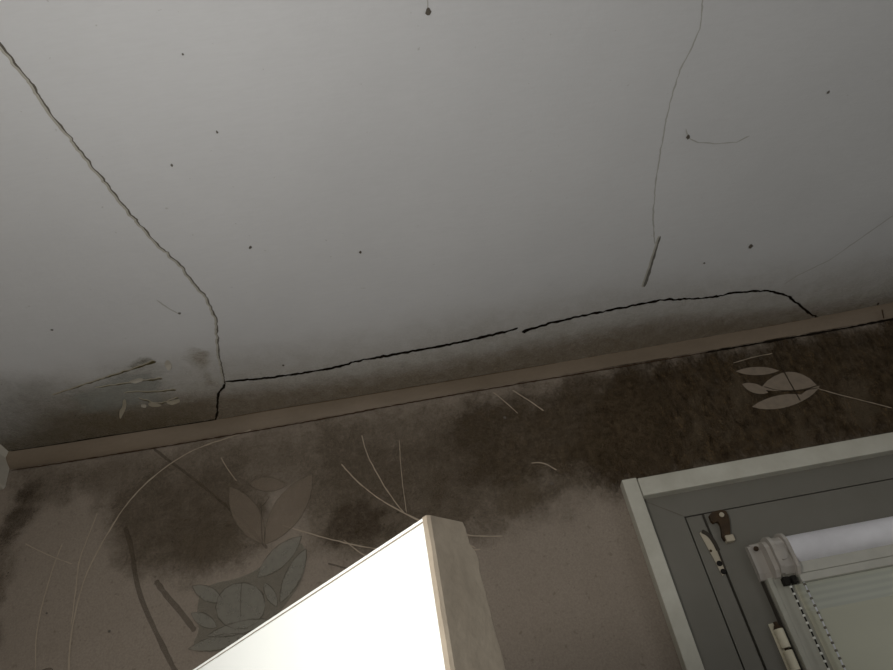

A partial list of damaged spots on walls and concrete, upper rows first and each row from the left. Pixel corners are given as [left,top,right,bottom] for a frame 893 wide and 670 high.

crack [652,0,703,244]
crack [0,42,893,471]
water stain [456,318,893,510]